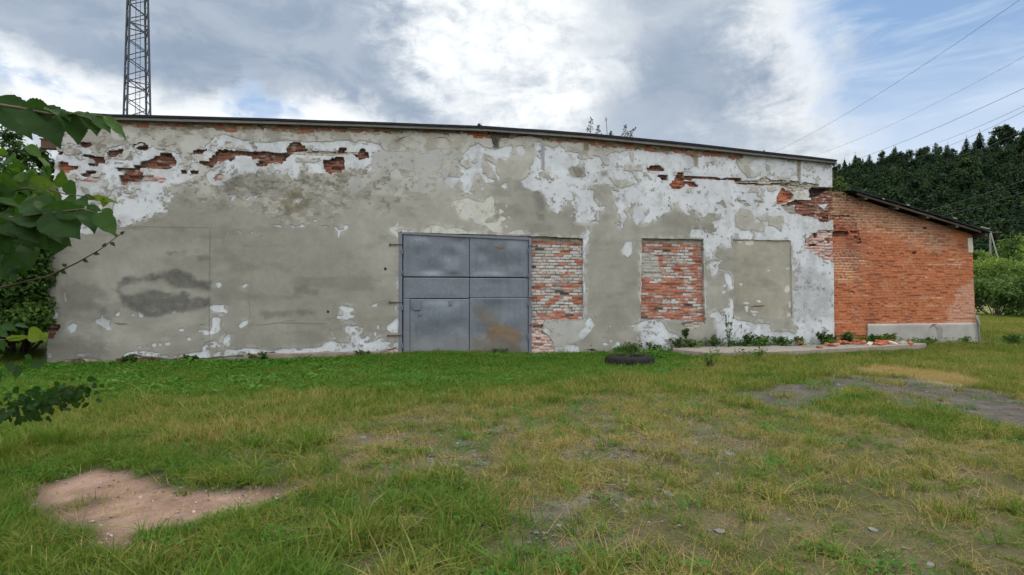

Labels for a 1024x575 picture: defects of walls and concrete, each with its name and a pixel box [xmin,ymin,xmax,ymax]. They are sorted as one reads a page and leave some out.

damp [123,271,208,316]
peeling [54,121,914,362]